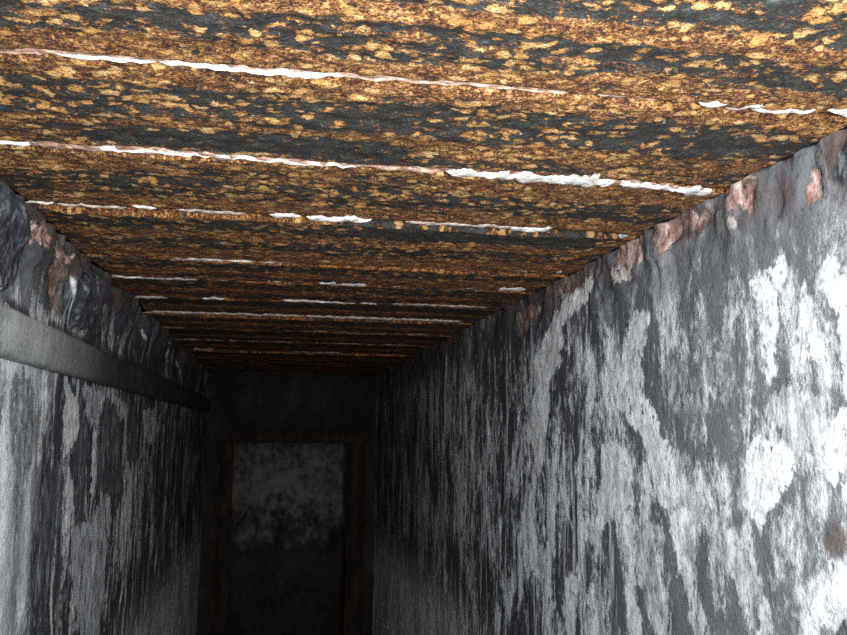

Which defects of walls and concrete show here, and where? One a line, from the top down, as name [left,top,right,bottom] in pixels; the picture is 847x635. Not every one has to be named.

leakage [0,48,569,94]
leakage [687,101,815,114]
leakage [0,140,712,197]
leakage [27,201,157,210]
leakage [269,213,372,223]
leakage [405,221,552,232]
leakage [0,365,38,532]
leakage [142,408,161,459]
leakage [31,381,127,635]
leakage [562,433,576,547]
leakage [564,572,578,635]
leakage [624,521,642,635]